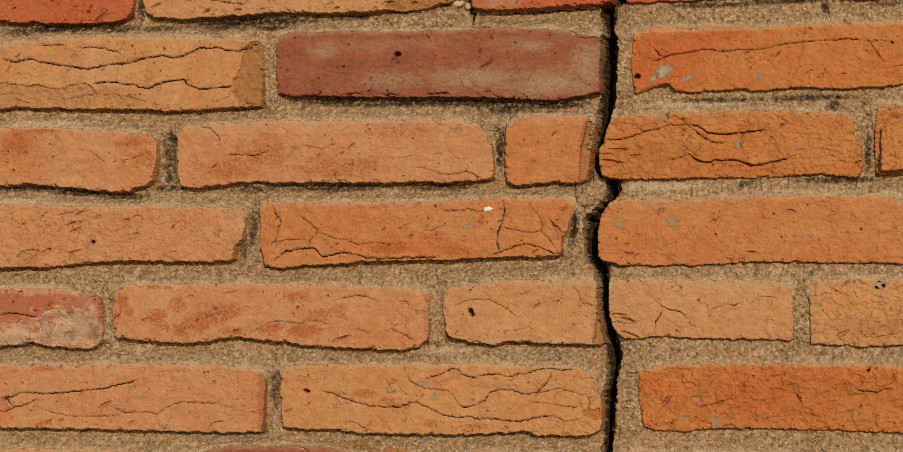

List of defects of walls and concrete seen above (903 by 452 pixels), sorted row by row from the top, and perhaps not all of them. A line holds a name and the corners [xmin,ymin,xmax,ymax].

crack [324,0,788,452]